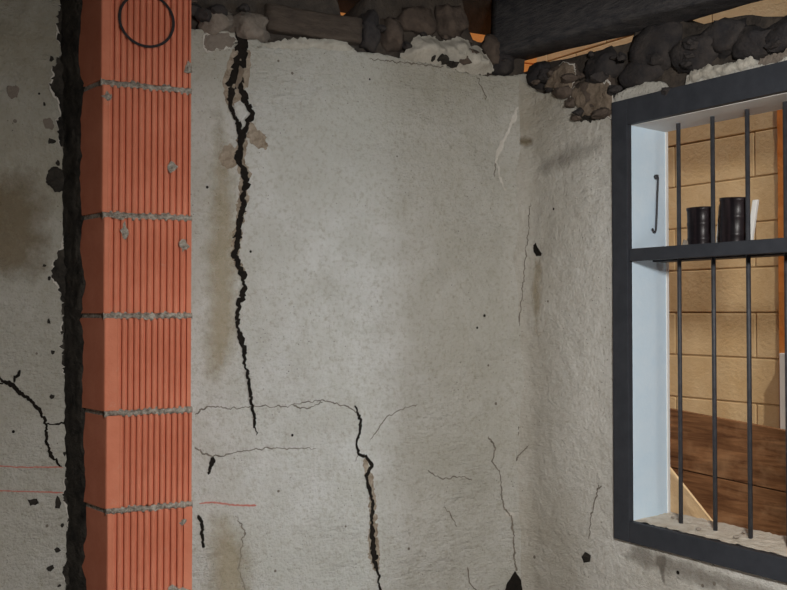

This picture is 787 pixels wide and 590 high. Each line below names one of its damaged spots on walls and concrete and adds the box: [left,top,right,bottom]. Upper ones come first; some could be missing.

spalling [191,0,228,22]
flaking render [43,5,65,147]
flaking render [431,39,480,68]
flaking render [545,61,623,123]
flaking render [758,48,787,65]
damp [0,185,41,267]
flaking render [43,235,67,382]
crack [195,32,416,590]
crack [0,370,64,467]
flaking render [55,467,69,531]
flaking render [46,547,70,590]